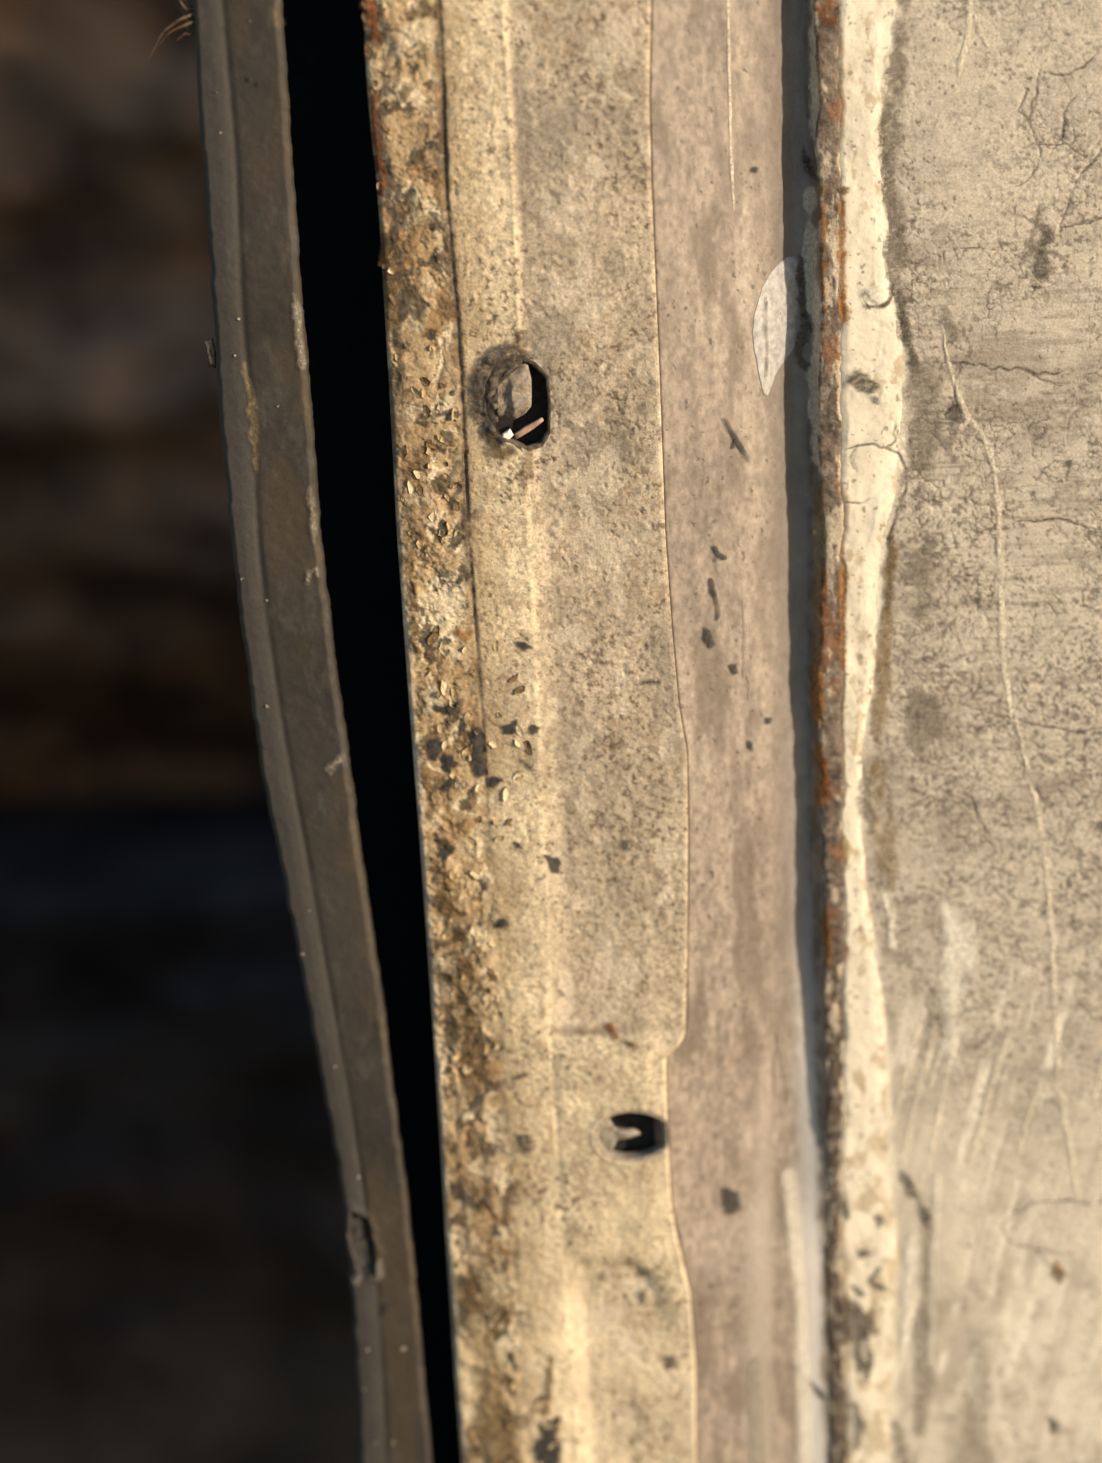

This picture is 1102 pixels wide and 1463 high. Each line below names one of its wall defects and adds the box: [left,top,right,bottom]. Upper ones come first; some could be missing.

crack [1018,53,1100,181]
corrosion [818,186,849,321]
crack [944,361,1062,423]
corrosion [809,487,849,805]
crack [1007,688,1087,733]